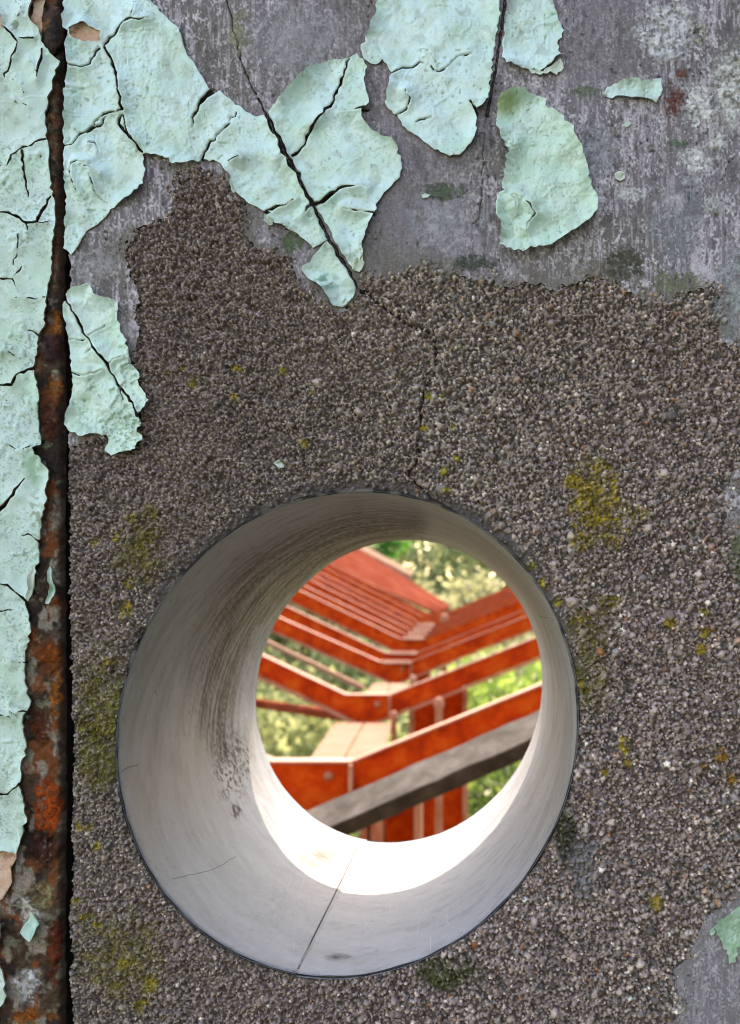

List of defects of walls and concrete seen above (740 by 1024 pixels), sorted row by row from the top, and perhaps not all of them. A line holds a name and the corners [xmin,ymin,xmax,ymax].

peeling [61,0,328,255]
crack [226,0,441,504]
peeling [268,0,501,272]
crack [471,0,507,224]
peeling [502,0,564,75]
peeling [496,86,598,251]
peeling [0,0,61,900]
corrosion [40,375,64,440]
corrosion [29,641,63,743]
spalling [63,165,740,1024]
corrosion [30,780,61,866]